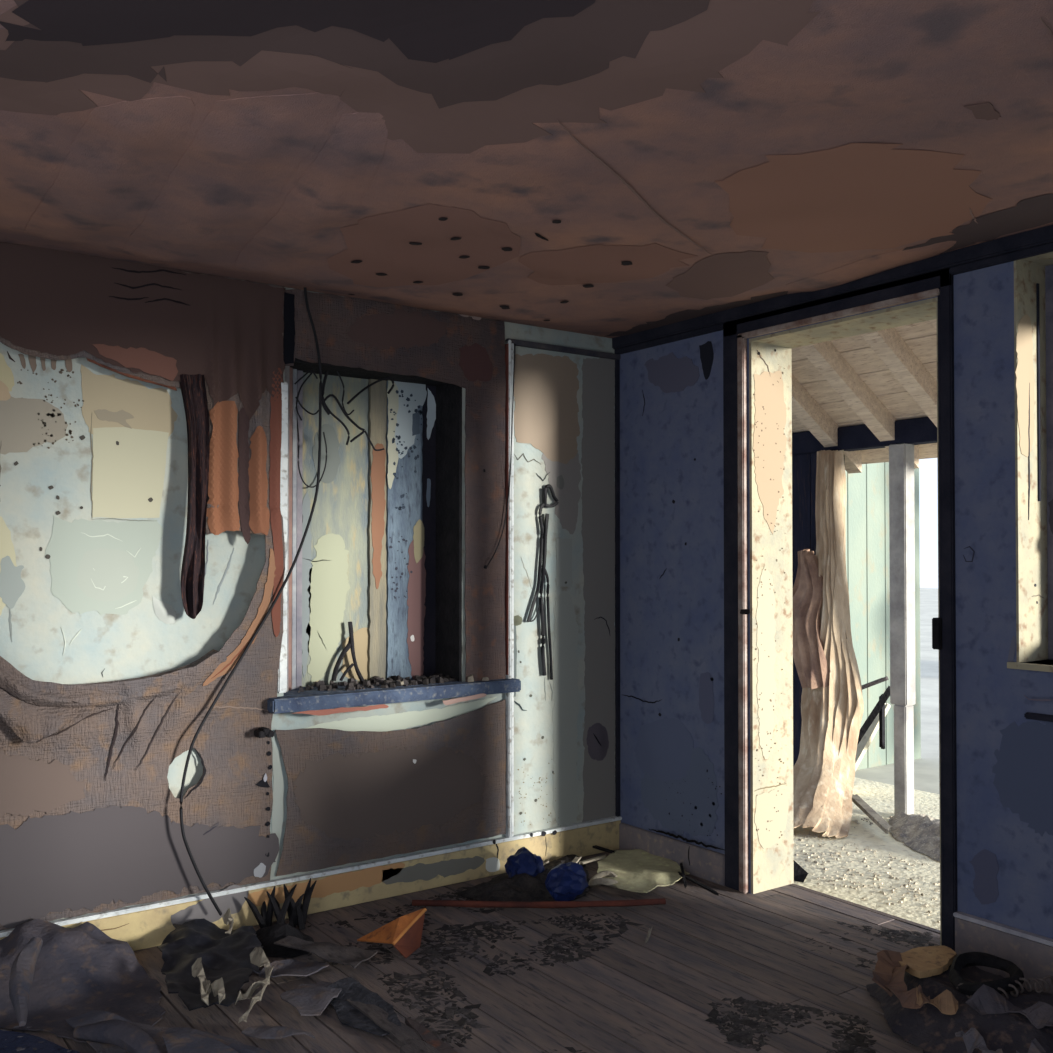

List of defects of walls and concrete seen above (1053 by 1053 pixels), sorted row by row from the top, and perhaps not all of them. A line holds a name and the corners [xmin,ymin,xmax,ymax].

peeling [387,380,436,489]
peeling [514,625,522,679]